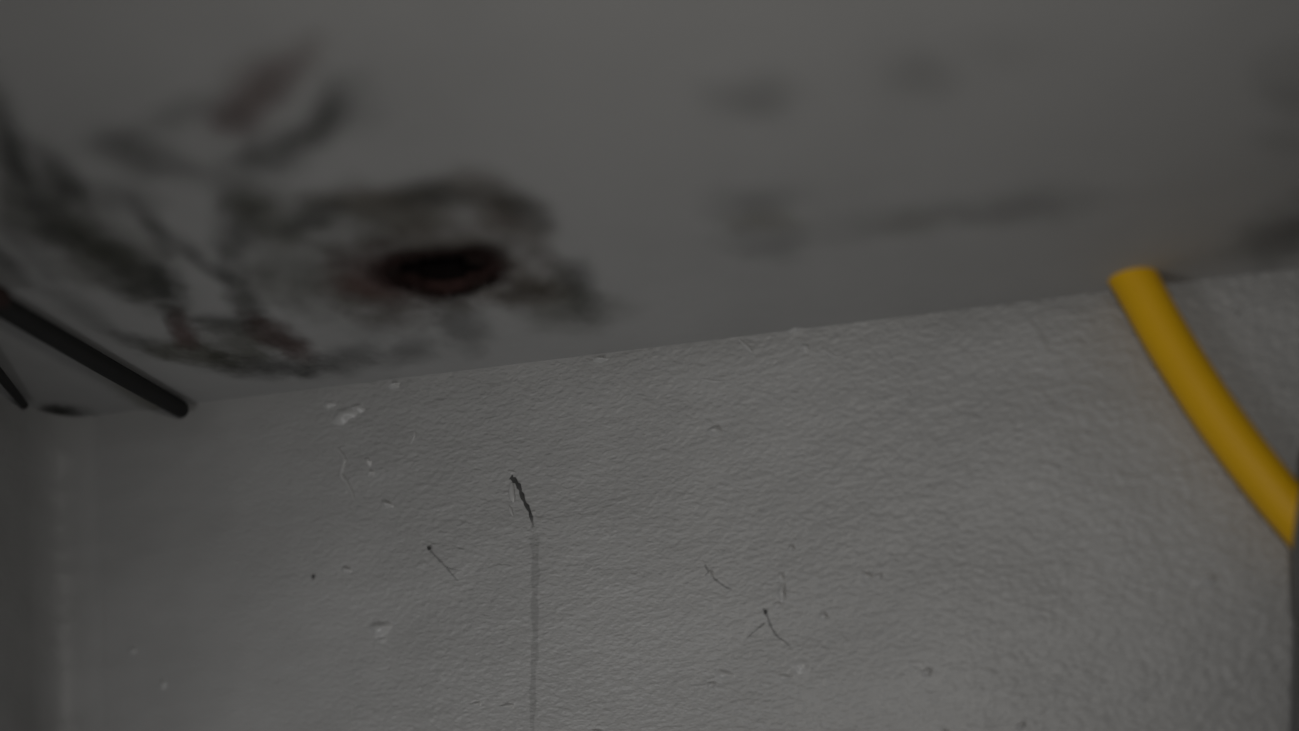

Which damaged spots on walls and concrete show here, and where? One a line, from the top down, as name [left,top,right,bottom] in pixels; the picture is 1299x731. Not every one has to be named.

spalling [373,246,507,298]
crack [507,470,533,520]